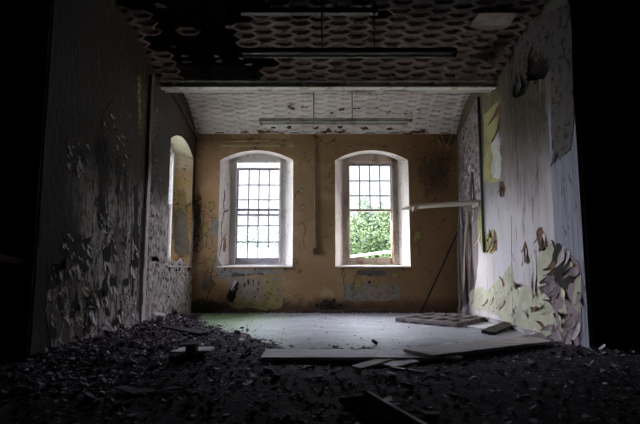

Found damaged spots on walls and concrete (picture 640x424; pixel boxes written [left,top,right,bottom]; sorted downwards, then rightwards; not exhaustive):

peeling [463,92,504,197]
peeling [45,189,197,348]
crack [174,199,228,301]
flaking render [197,215,284,311]
flaking render [344,270,401,301]
peeling [461,206,583,346]